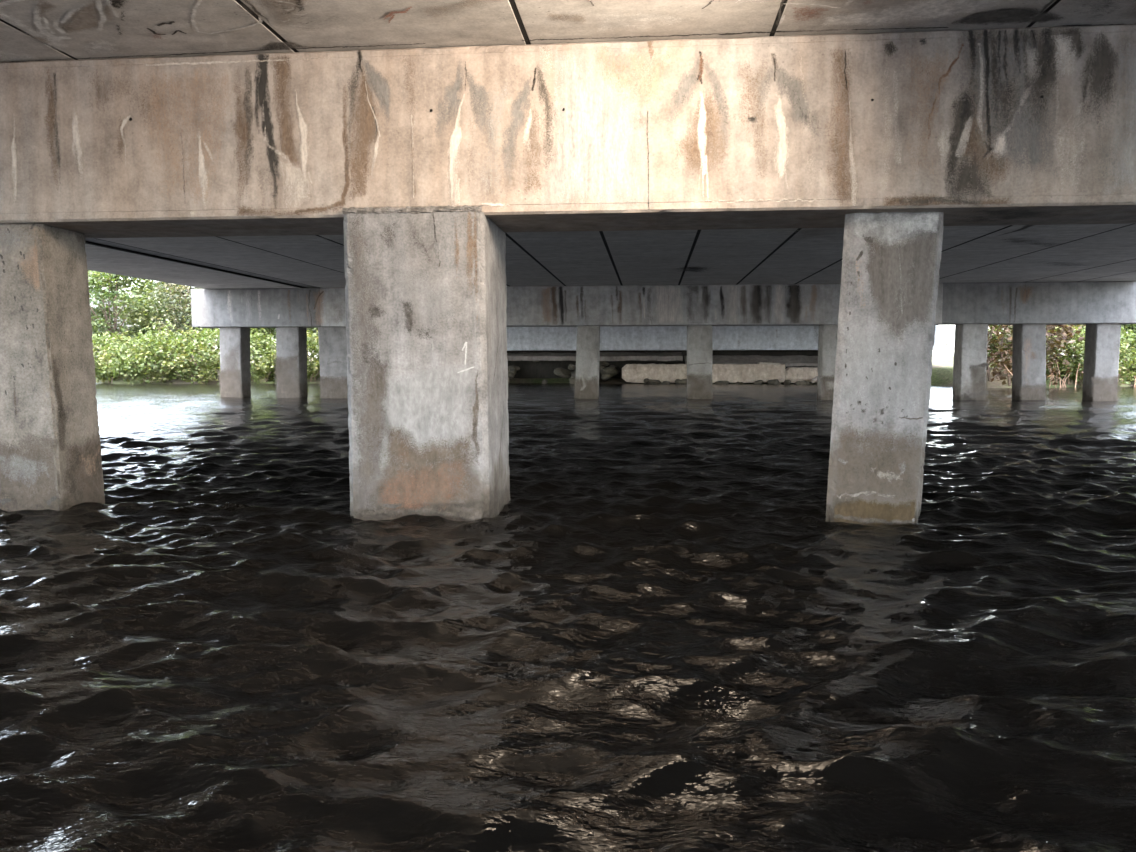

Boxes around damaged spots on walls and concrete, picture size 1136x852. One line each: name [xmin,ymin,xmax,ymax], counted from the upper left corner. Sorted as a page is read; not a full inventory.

damp [0,0,426,216]
damp [386,0,1136,388]
corrosion [375,421,479,516]